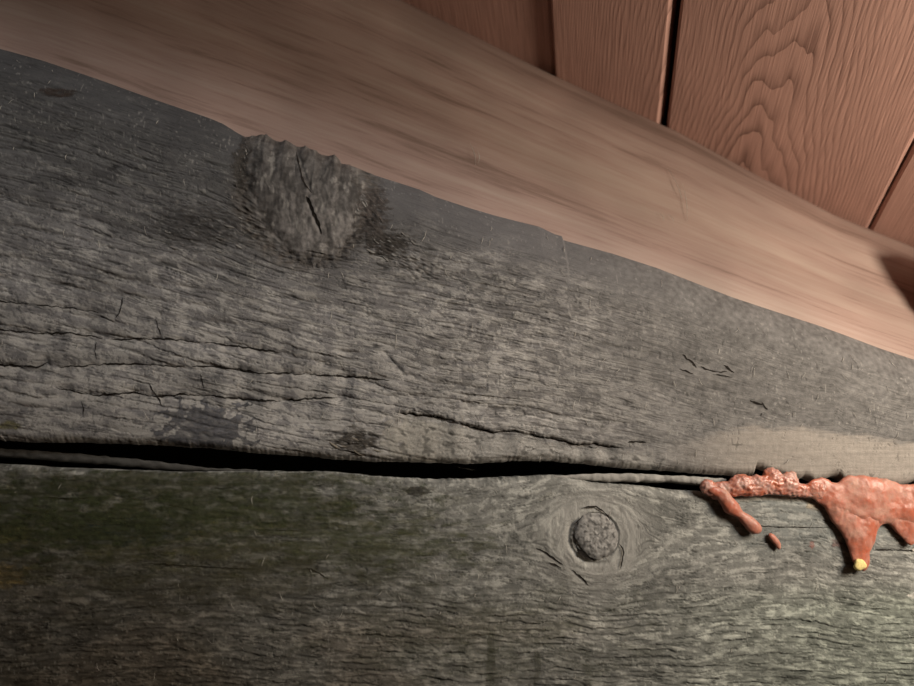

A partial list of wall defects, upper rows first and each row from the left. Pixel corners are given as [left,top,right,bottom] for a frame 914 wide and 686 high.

leakage [150,396,260,450]
crack [397,412,646,458]